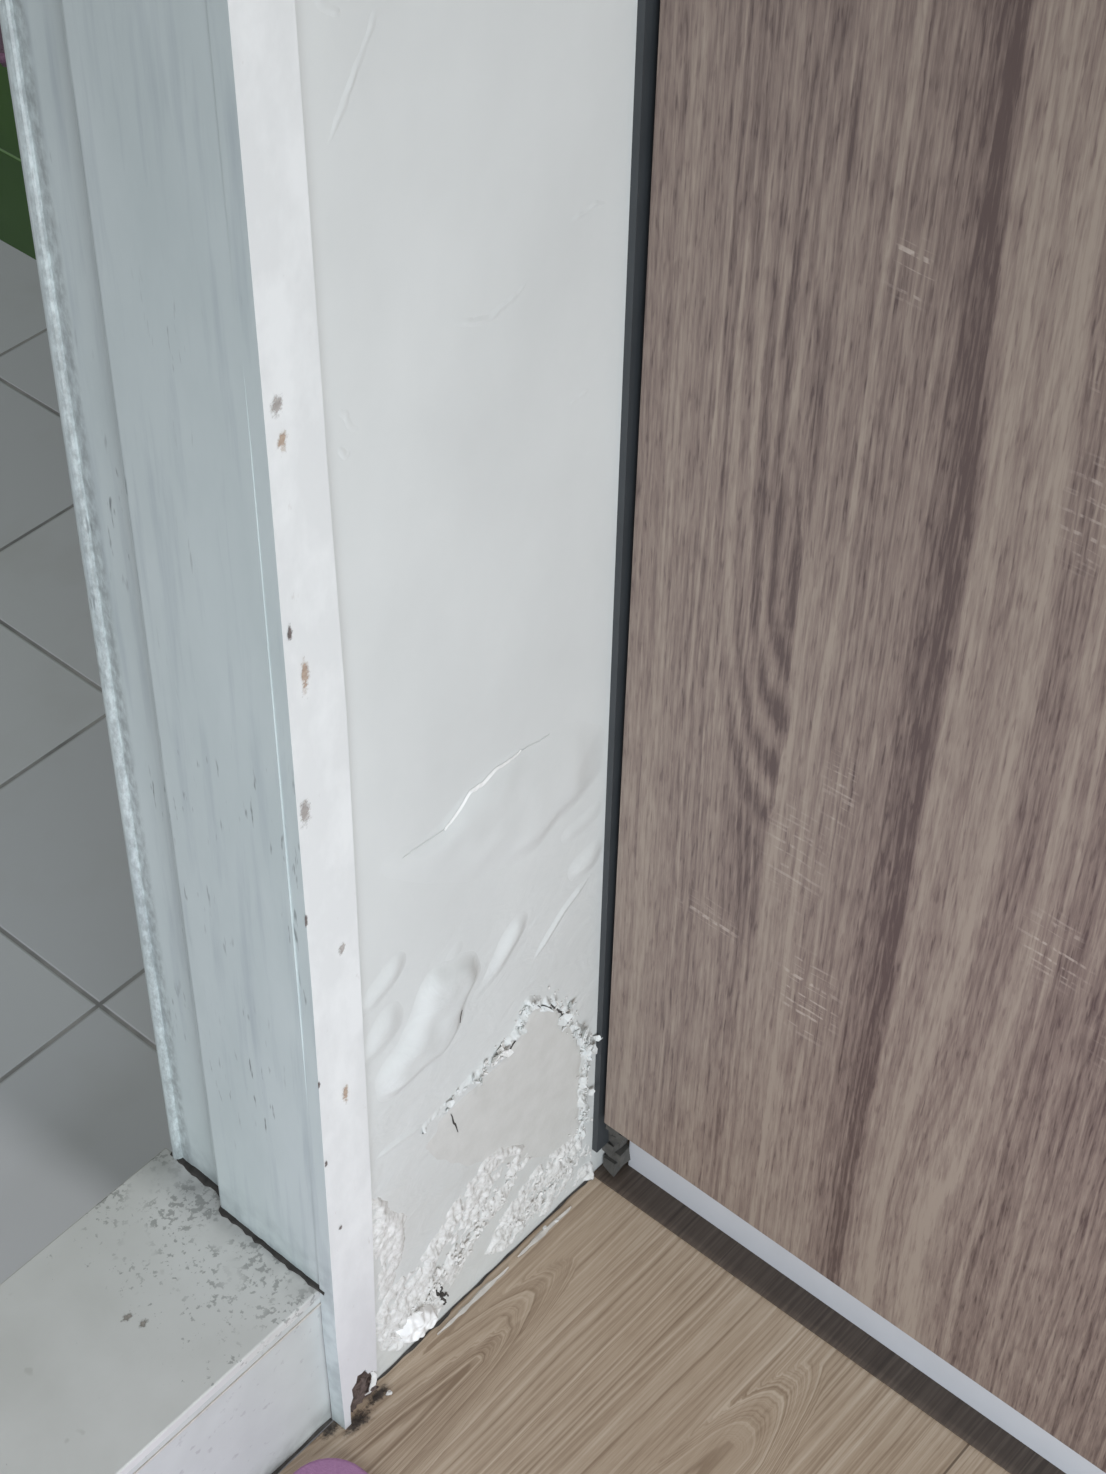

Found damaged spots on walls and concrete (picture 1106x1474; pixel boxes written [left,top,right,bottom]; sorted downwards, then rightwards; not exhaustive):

peeling [422,987,601,1166]